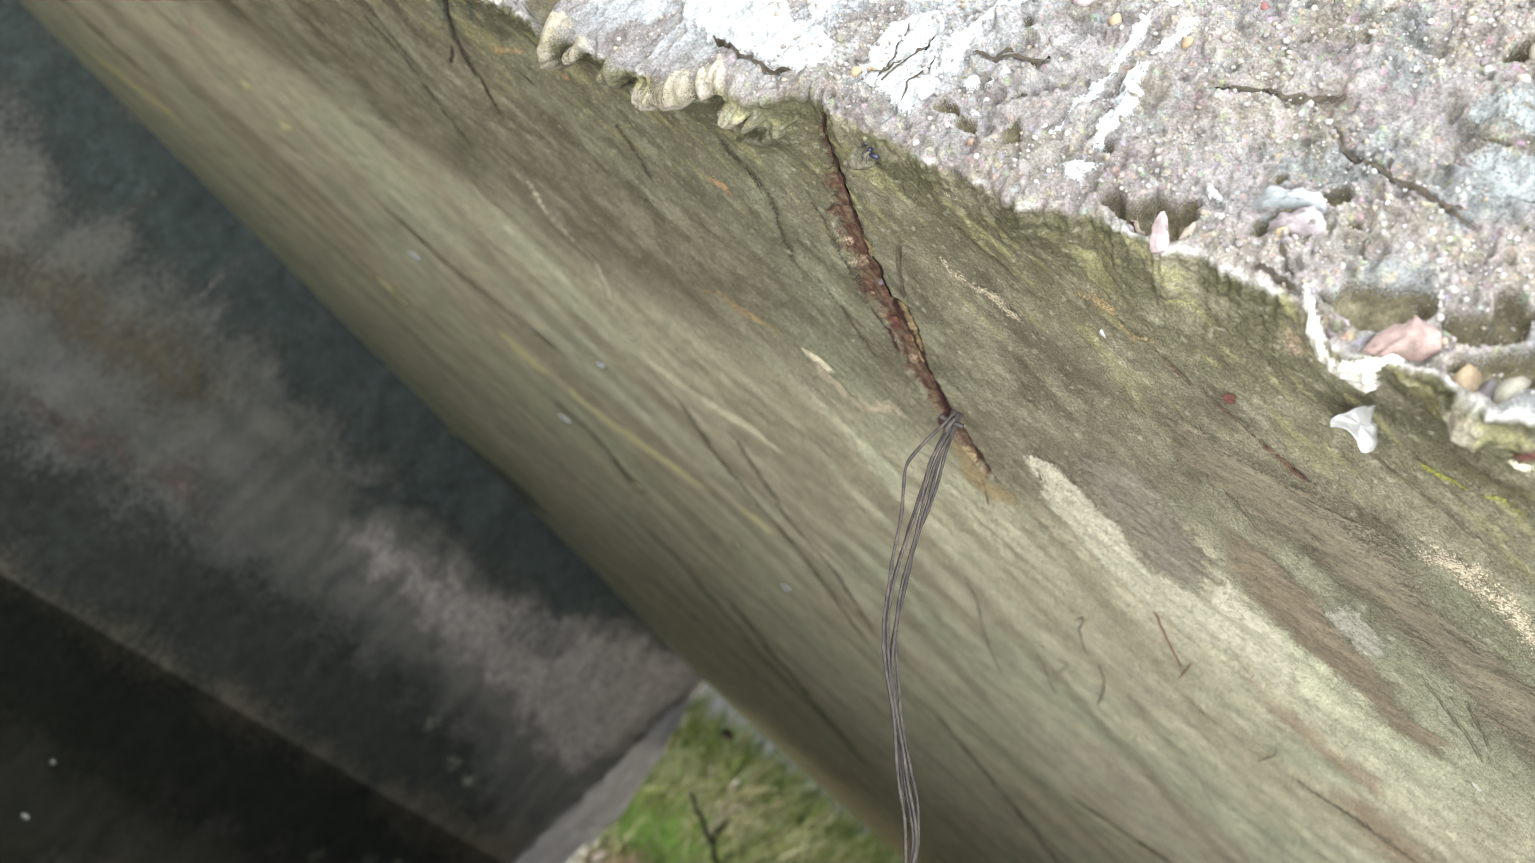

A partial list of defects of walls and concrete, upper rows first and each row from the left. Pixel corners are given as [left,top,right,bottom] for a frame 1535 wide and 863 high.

crack [416,0,535,146]
spalling [524,0,560,35]
peeling [678,0,836,75]
peeling [857,10,1011,134]
spalling [1502,40,1535,63]
spalling [998,115,1021,144]
peeling [1060,138,1114,188]
peeling [1452,80,1535,210]
spalling [1099,183,1230,254]
spalling [1244,172,1364,240]
damp [366,170,712,493]
spalling [1318,277,1535,404]